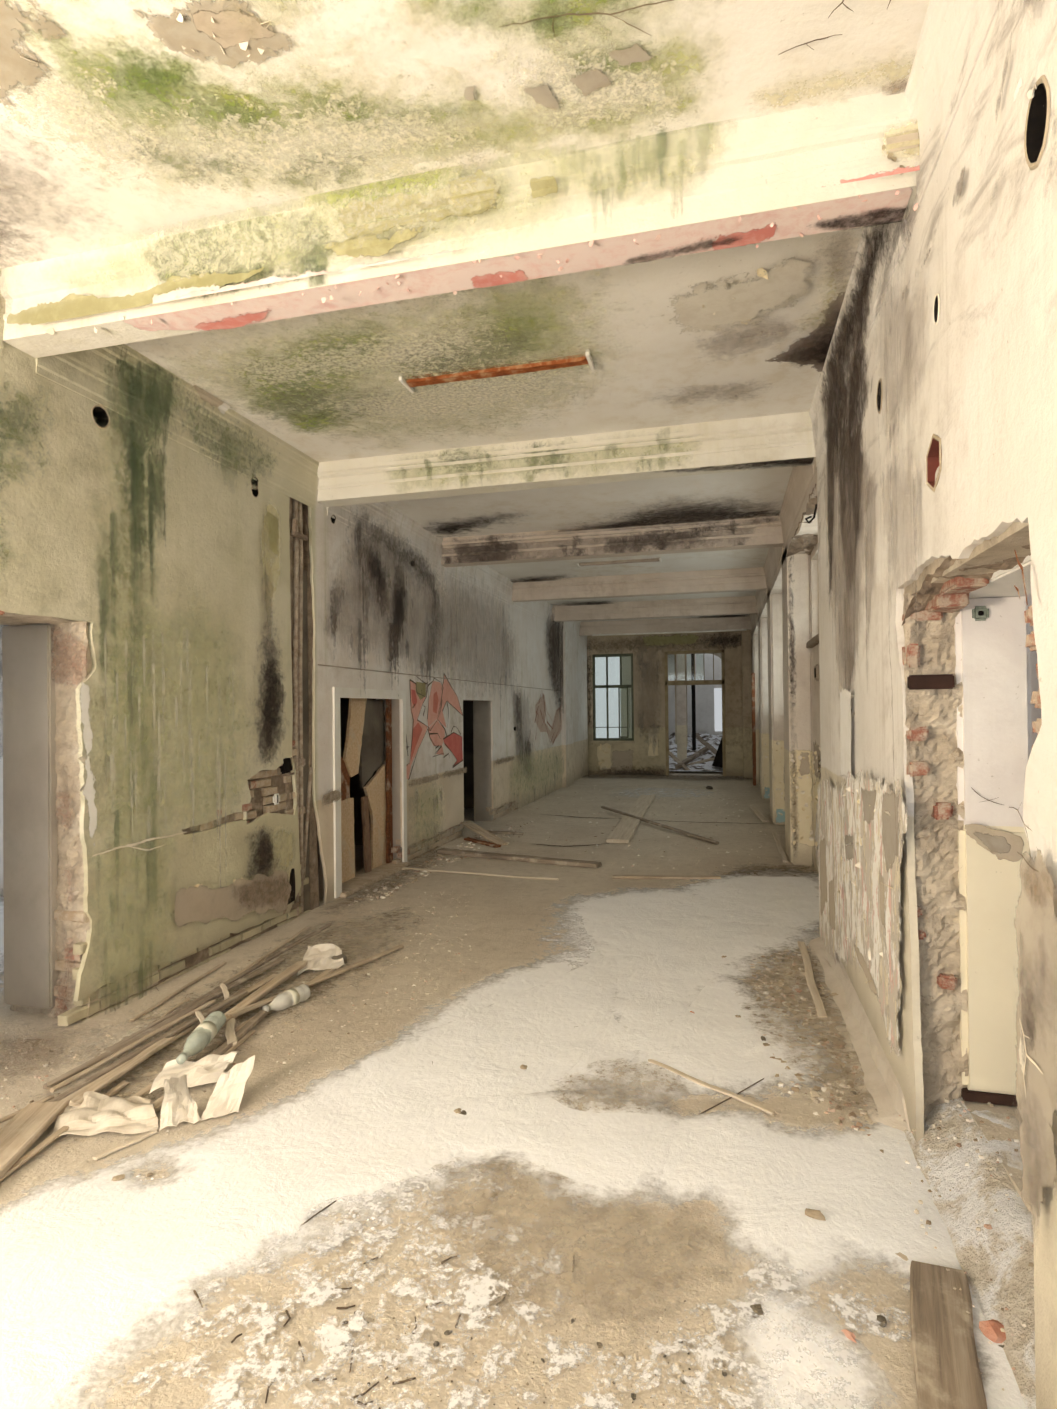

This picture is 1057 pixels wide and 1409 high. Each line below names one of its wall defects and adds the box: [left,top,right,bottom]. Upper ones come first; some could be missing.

peeling [0,0,66,107]
peeling [133,0,292,68]
leakage [4,0,703,211]
leakage [147,213,333,289]
leakage [826,284,869,599]
leakage [257,507,285,760]
leakage [331,515,440,677]
leakage [604,518,772,553]
spalling [1024,605,1042,750]
spalling [0,610,310,1026]
spalling [321,790,341,805]
spalling [762,545,1031,1119]